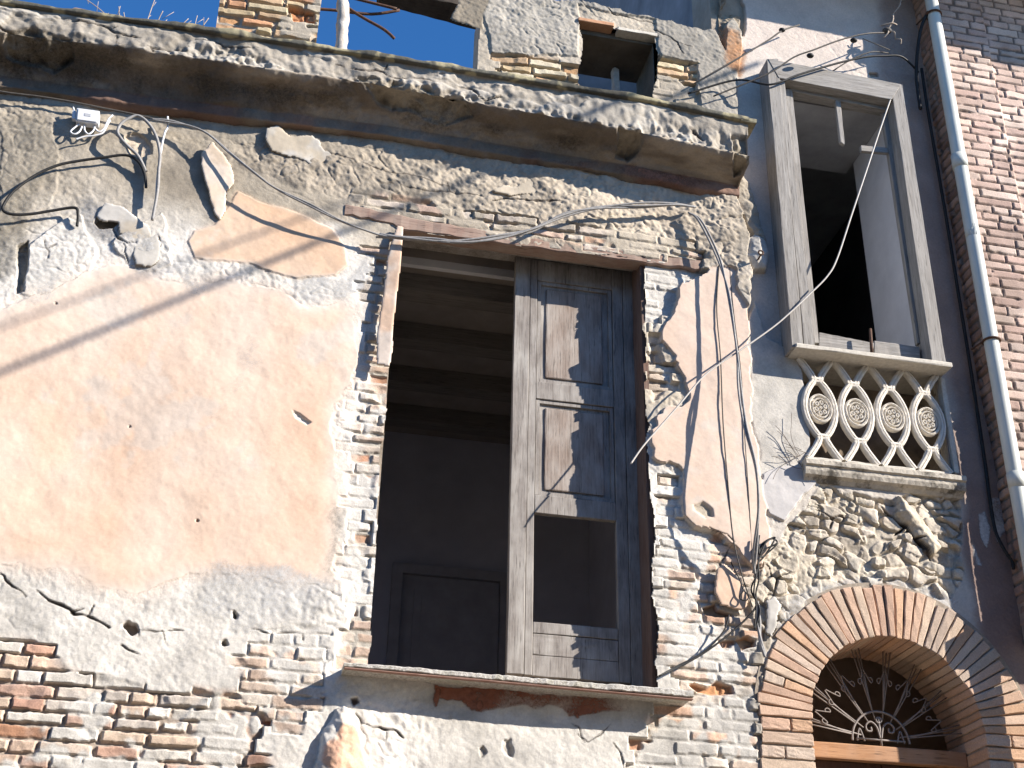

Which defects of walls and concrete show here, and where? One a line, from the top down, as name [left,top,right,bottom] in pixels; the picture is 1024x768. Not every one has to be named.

flaking render [490,47,579,85]
peeling [0,142,964,768]
crack [0,573,183,654]